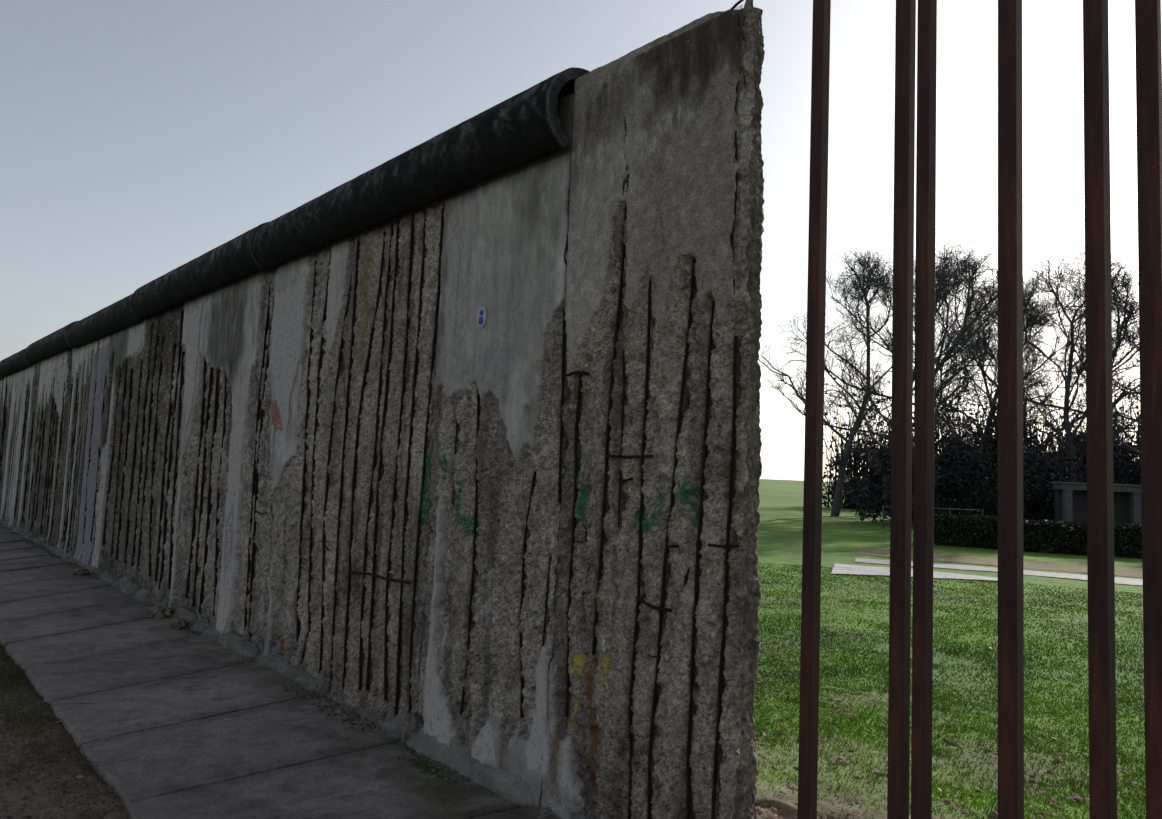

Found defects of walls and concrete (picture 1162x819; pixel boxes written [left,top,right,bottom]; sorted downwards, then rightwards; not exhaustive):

leakage [637,5,743,96]
spalling [0,0,765,819]
corrosion [584,662,600,786]